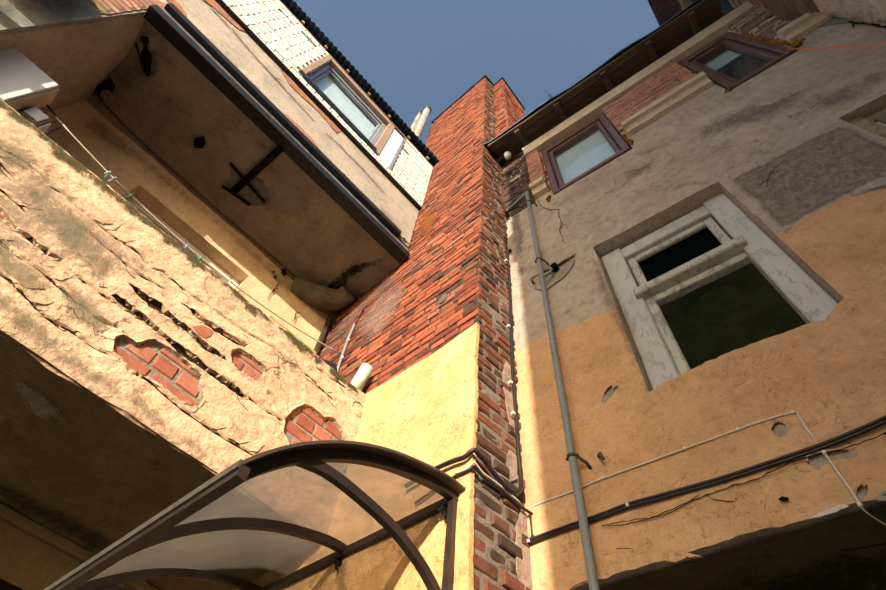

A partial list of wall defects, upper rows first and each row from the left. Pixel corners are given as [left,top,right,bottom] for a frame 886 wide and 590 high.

flaking render [87,0,187,16]
flaking render [202,0,246,32]
crack [0,146,76,213]
crack [0,239,118,355]
crack [84,220,254,338]
flaking render [109,280,267,409]
crack [136,373,263,456]
crack [237,394,280,420]
flaking render [282,402,349,445]
crack [290,362,352,408]
flaking render [326,463,349,475]
peeling [805,504,850,521]